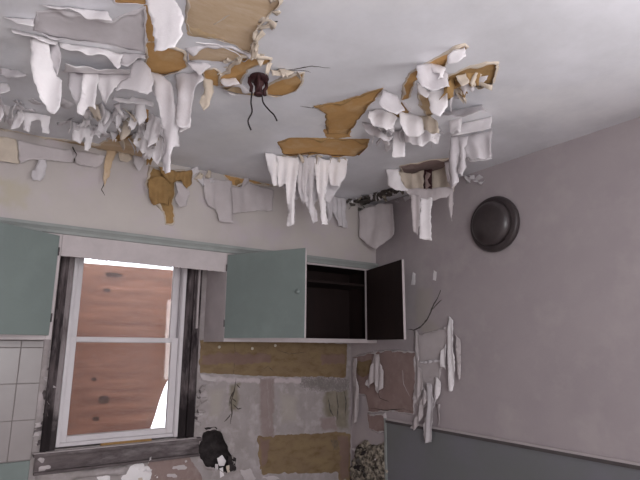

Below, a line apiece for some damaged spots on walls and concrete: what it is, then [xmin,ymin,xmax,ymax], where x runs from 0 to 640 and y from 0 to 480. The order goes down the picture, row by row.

peeling [0,0,499,249]
crack [409,290,441,331]
peeling [352,354,384,424]
peeling [410,316,461,443]